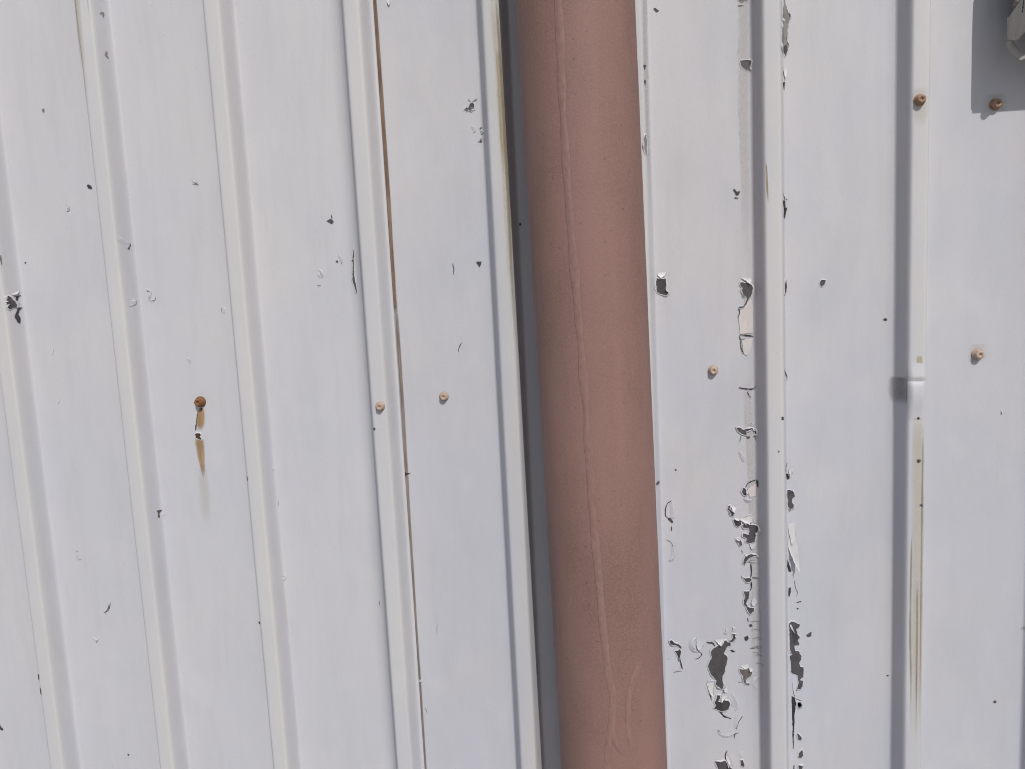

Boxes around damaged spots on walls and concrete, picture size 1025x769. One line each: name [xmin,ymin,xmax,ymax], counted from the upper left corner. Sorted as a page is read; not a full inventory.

peeling [781,0,792,89]
peeling [3,290,22,324]
peeling [654,272,670,297]
peeling [738,277,755,355]
rust [194,408,204,472]
peeling [735,422,759,462]
peeling [727,480,761,566]
peeling [786,465,800,572]
peeling [706,621,763,719]
peeling [788,620,812,709]
peeling [714,750,745,769]
spalling [796,732,804,769]